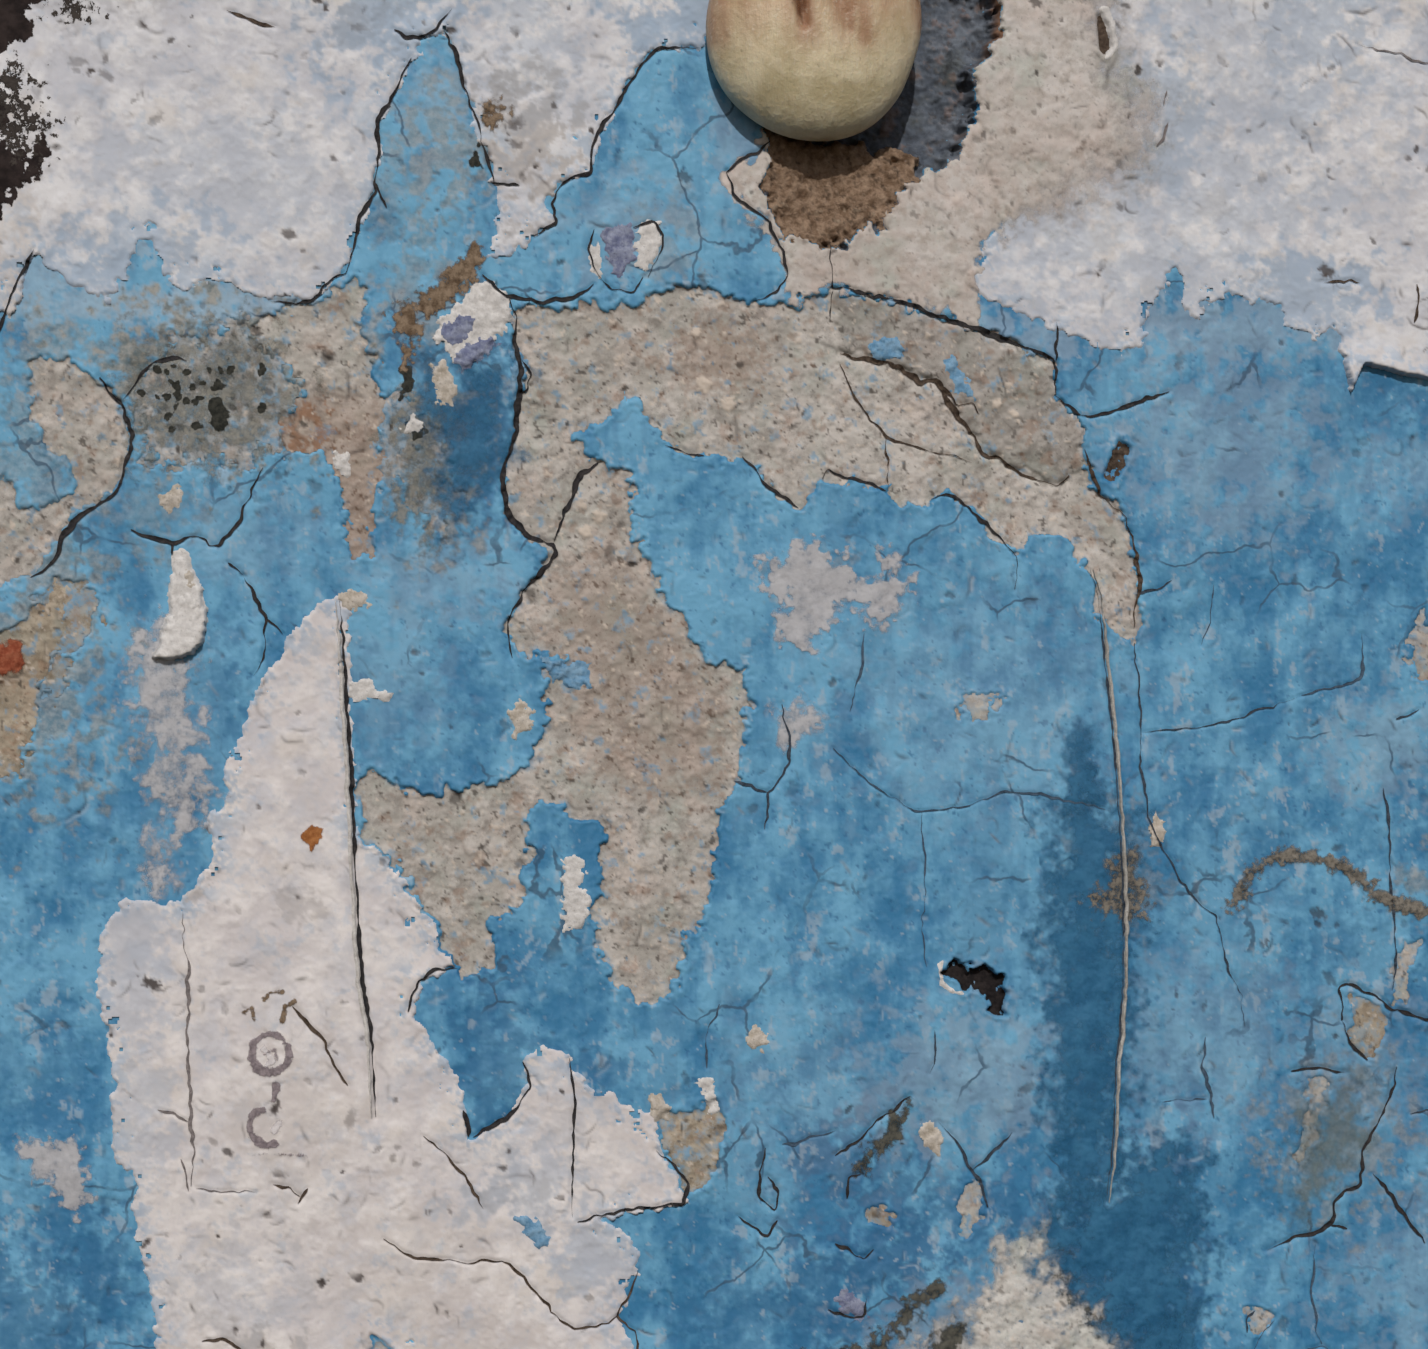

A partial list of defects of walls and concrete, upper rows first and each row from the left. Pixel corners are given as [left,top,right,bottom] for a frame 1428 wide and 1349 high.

damp [0,0,118,220]
crack [273,10,519,305]
crack [534,46,696,236]
crack [31,356,187,577]
spalling [0,277,466,587]
crack [482,220,664,656]
spalling [0,577,107,779]
peeling [95,0,1160,1349]
crack [292,601,376,1118]
crack [569,1058,690,1222]
crack [1268,788,1428,1349]
crack [384,1239,639,1349]